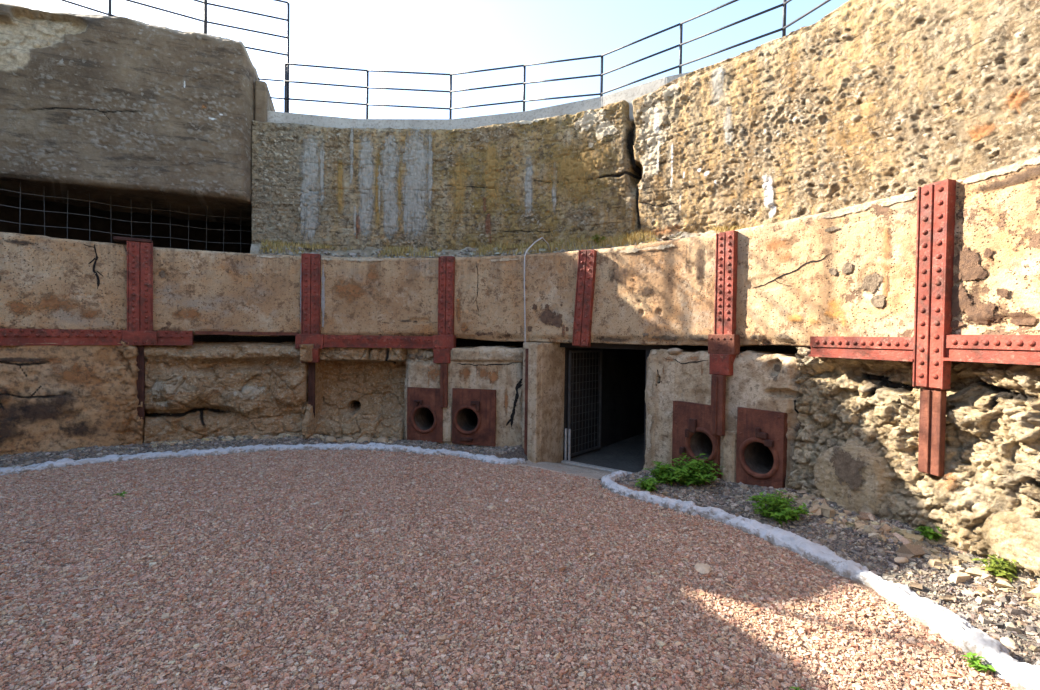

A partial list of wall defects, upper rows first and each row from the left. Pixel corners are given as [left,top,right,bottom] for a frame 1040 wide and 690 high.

leakage [300,138,325,241]
leakage [337,128,433,238]
crack [586,124,674,230]
corrosion [9,294,101,318]
crack [750,253,831,290]